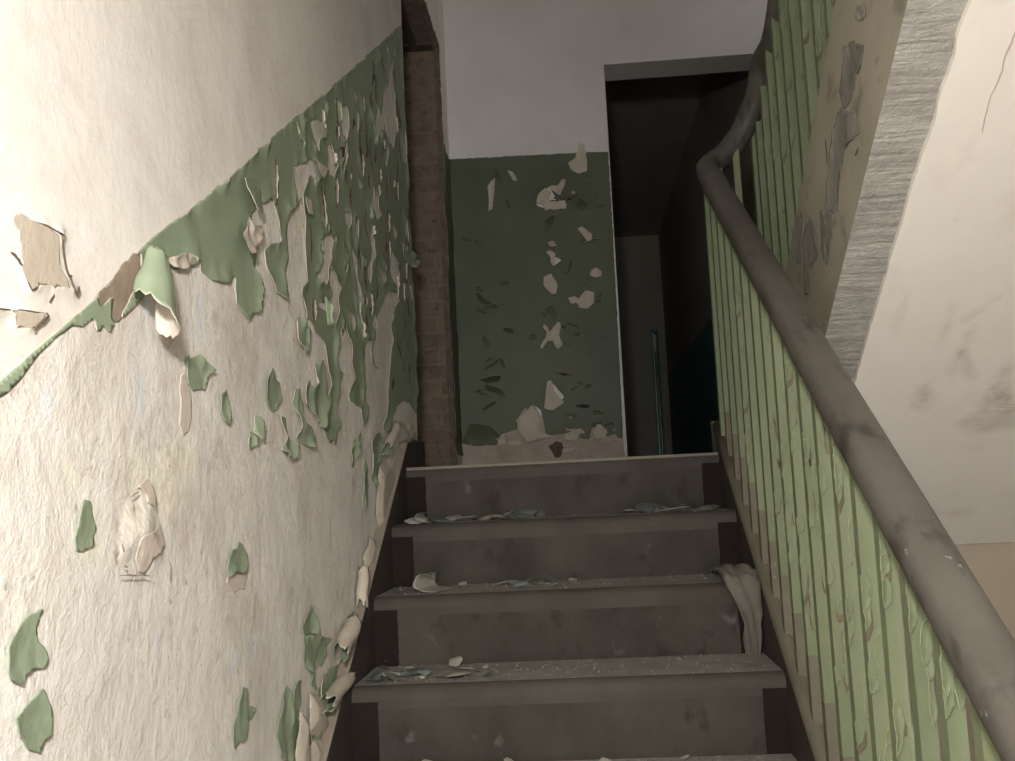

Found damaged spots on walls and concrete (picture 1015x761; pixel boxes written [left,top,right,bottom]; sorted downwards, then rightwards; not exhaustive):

peeling [418,0,625,466]
peeling [0,26,420,527]
peeling [74,499,96,551]
peeling [226,542,249,593]
peeling [8,609,49,685]
peeling [277,536,377,761]
peeling [15,688,53,752]
peeling [233,687,256,750]